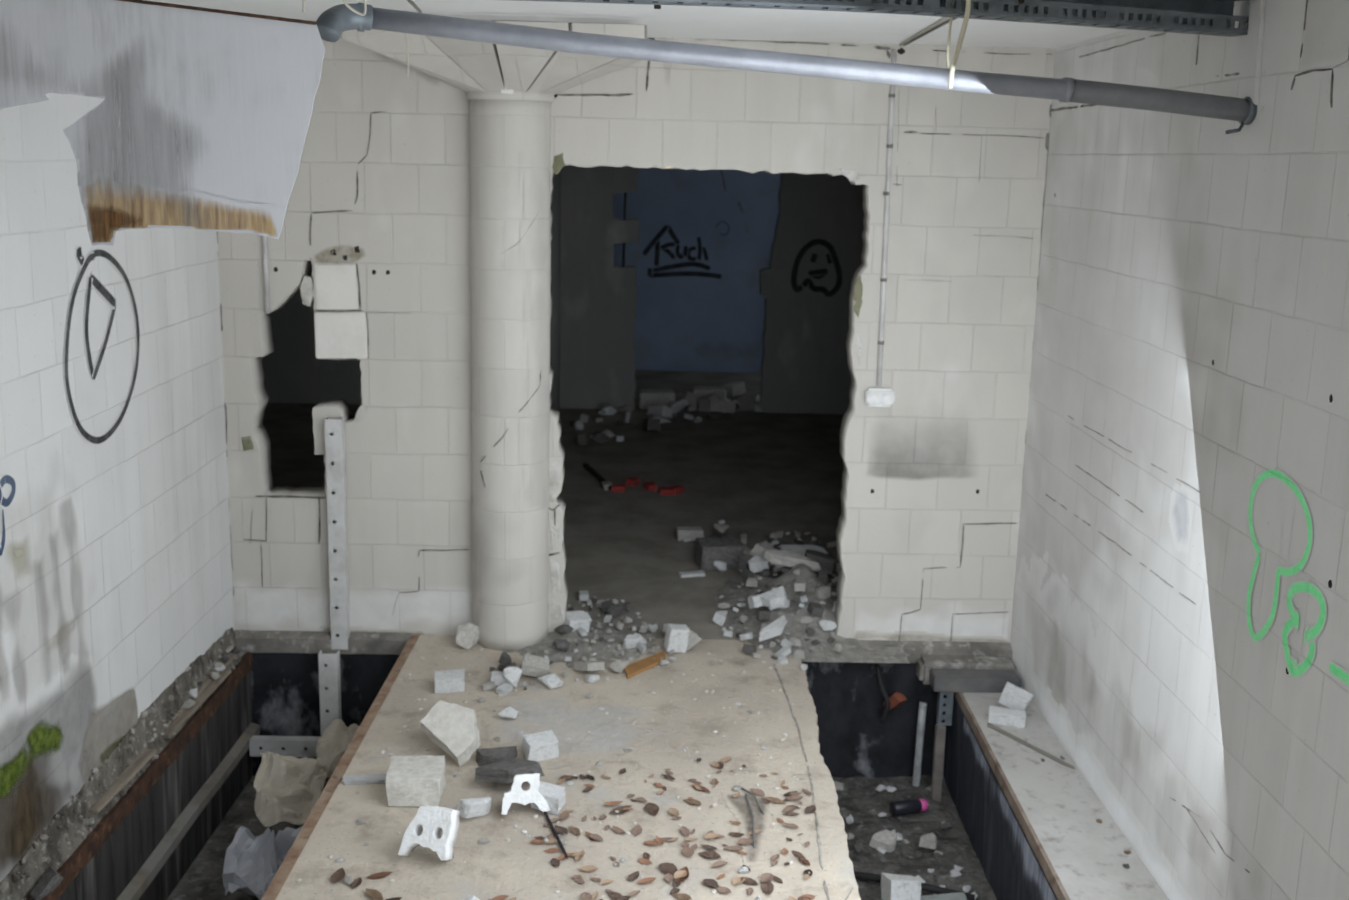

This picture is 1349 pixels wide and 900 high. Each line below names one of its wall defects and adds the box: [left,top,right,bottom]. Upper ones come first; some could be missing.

spalling [837,168,859,182]
peeling [300,275,314,306]
spalling [853,276,863,365]
spalling [355,406,367,422]
spalling [549,461,565,620]
crack [898,523,1016,642]
leakage [0,433,138,844]
spalling [57,670,296,900]
leakage [0,857,22,882]